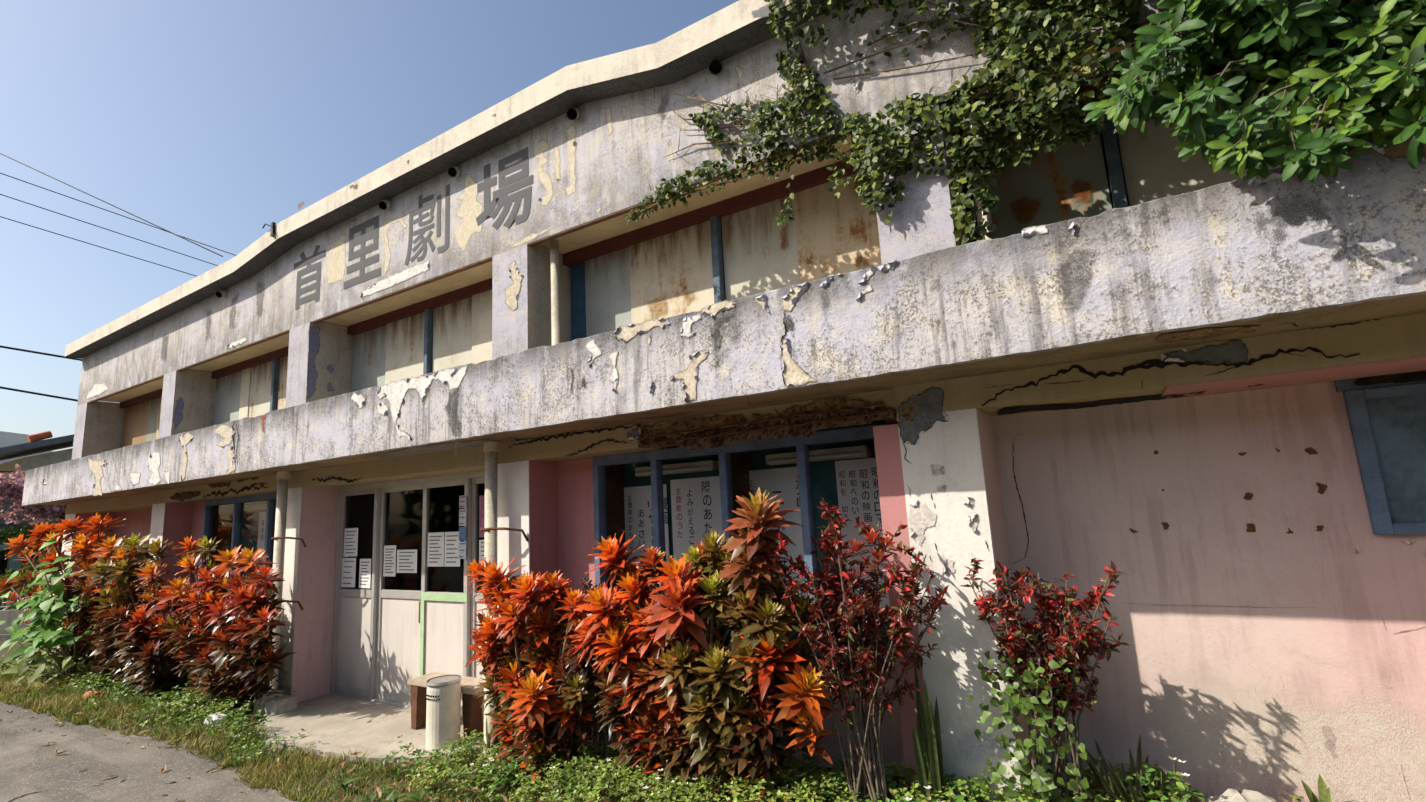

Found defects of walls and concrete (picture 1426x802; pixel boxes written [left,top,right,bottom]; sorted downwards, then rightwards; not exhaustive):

peeling [505,126,601,310]
damp [1253,189,1346,259]
peeling [754,273,840,313]
peeling [856,259,897,302]
damp [930,272,958,352]
damp [1056,246,1100,317]
peeling [88,397,259,502]
peeling [307,326,334,399]
peeling [351,365,492,458]
spalling [585,300,949,450]
crack [981,318,1382,406]
peeling [964,497,978,532]